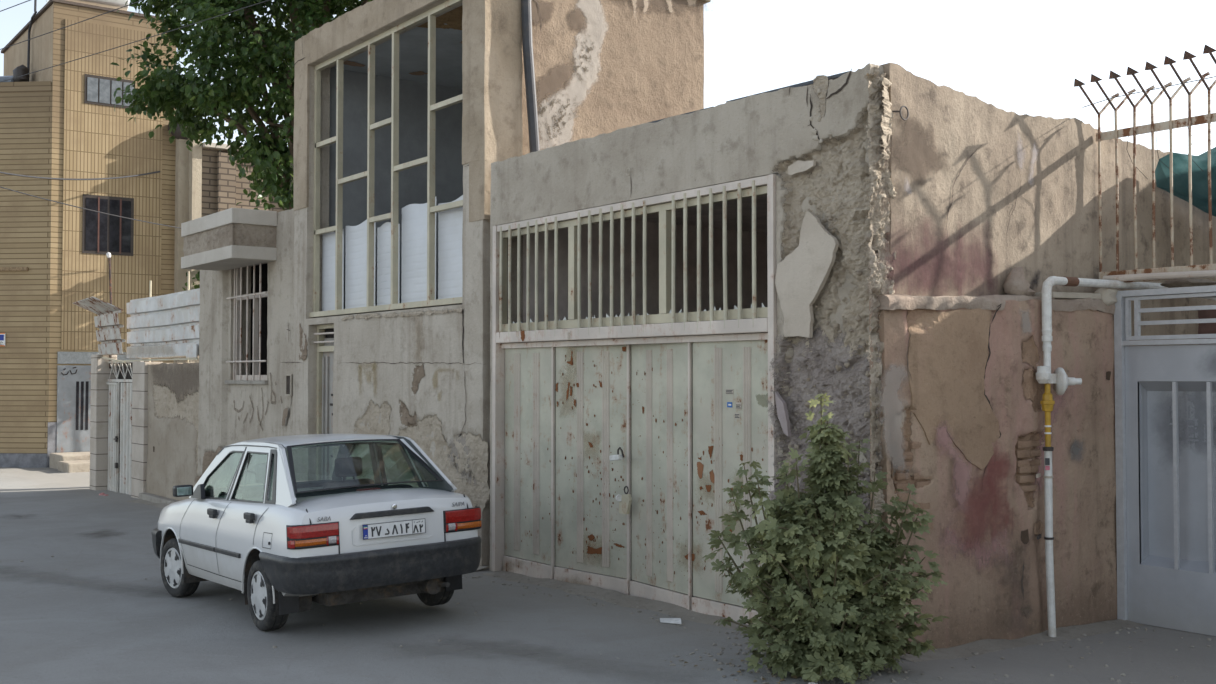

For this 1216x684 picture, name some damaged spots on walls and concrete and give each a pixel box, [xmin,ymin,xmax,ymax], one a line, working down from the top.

leakage [893,119,943,191]
spalling [767,66,937,542]
leakage [887,228,994,296]
spalling [153,383,226,489]
spalling [353,364,490,511]
rust [555,351,625,560]
rust [684,437,743,530]
flaking render [1014,432,1043,508]